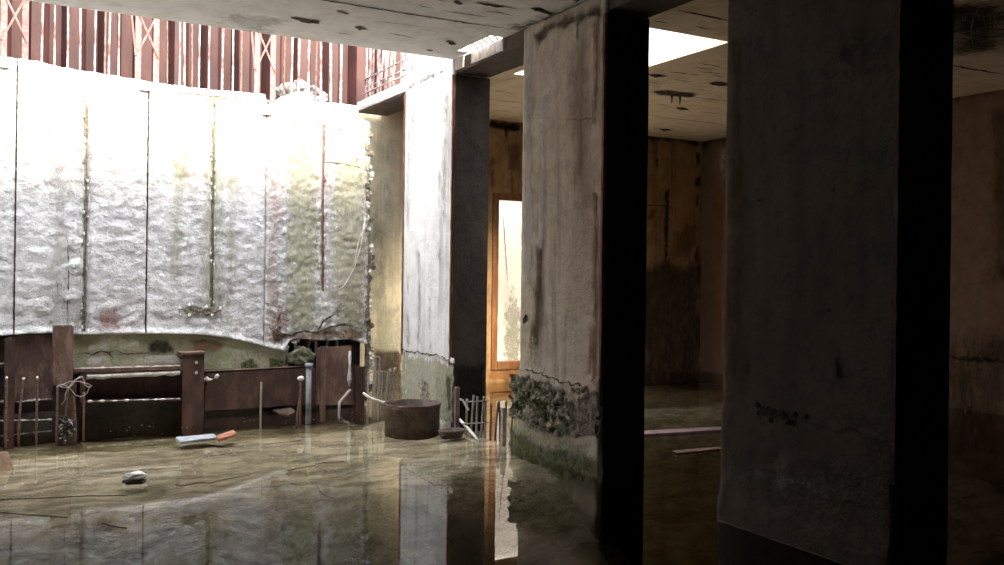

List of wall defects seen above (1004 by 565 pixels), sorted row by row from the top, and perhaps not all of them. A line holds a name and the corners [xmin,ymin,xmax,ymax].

leakage [654,90,695,105]
leakage [204,95,237,309]
rust [97,307,122,331]
crack [517,367,593,391]
leakage [509,427,601,484]